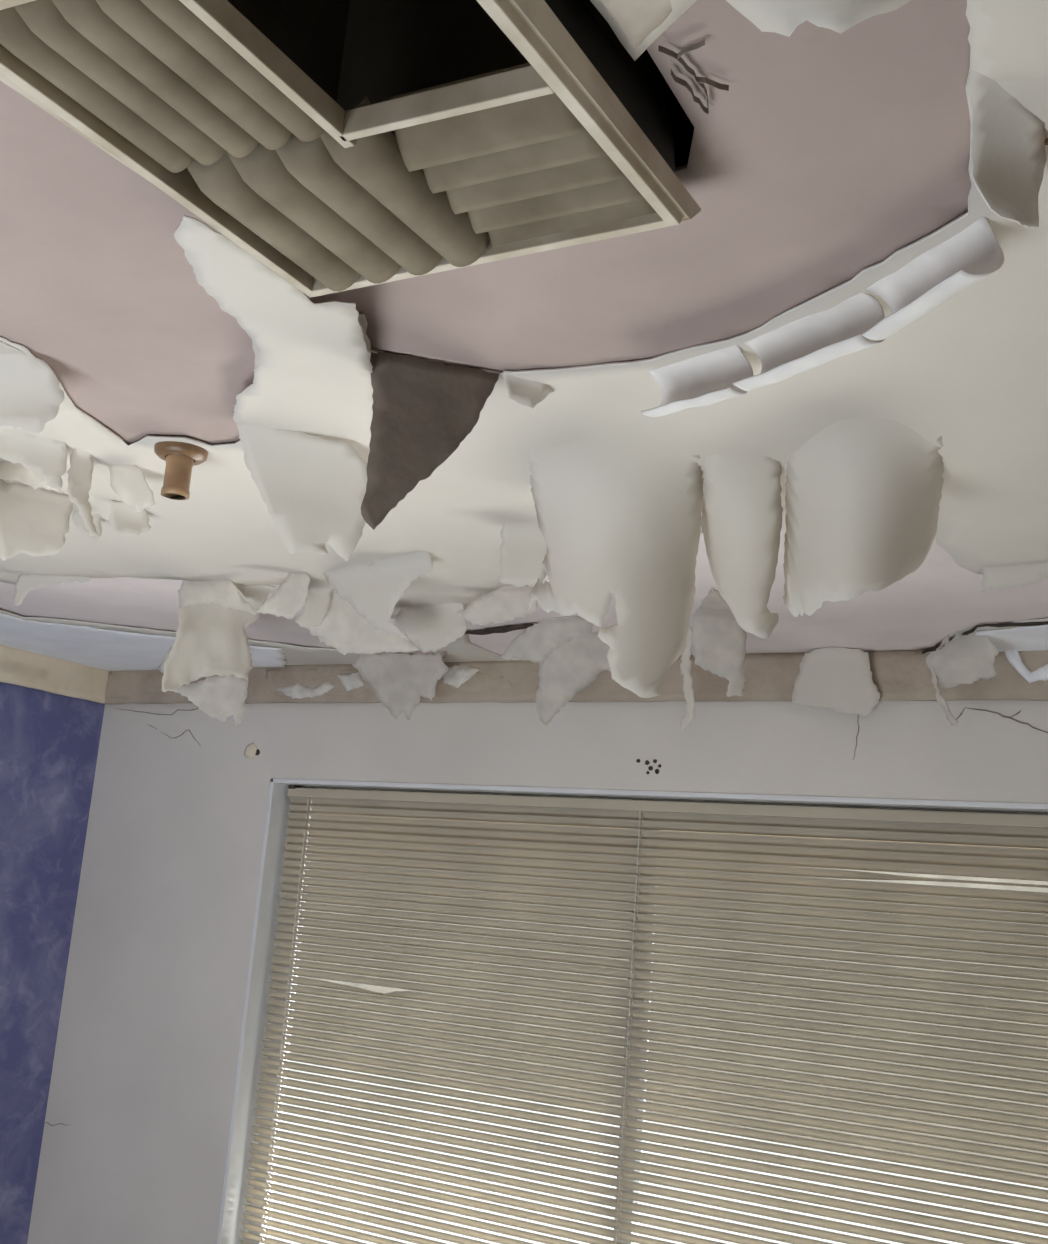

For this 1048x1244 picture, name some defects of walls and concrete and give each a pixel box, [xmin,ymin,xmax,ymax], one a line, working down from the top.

peeling [0,0,1048,732]